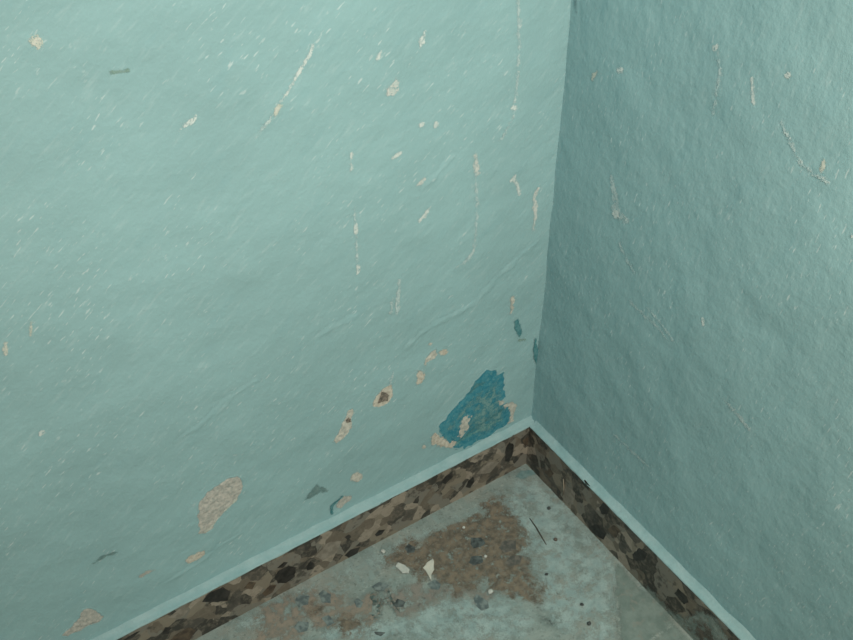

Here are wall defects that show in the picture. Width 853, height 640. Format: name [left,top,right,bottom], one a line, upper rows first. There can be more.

flaking render [332,407,355,444]
flaking render [371,371,394,408]
peeling [422,368,517,450]
flaking render [195,475,244,535]